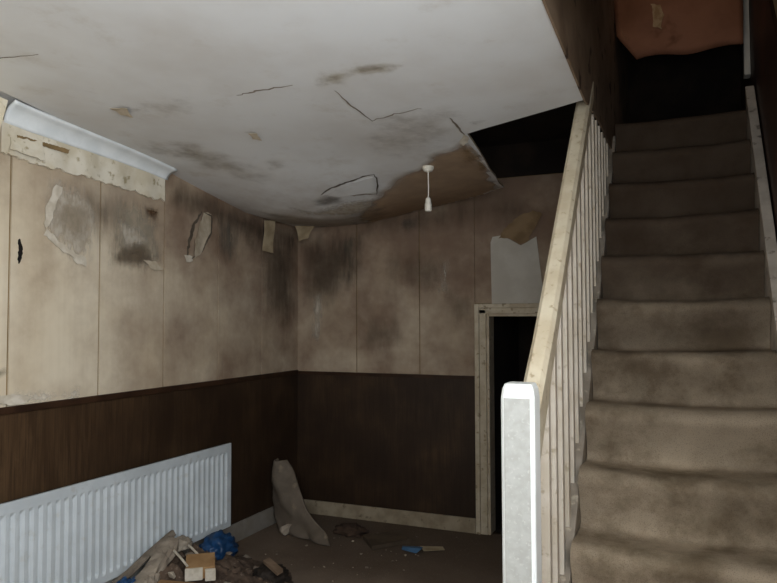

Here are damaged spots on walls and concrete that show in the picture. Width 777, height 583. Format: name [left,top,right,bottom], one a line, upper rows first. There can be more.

crack [237,85,292,96]
crack [335,91,419,121]
peeling [17,135,69,154]
peeling [44,182,93,267]
water stain [115,207,163,271]